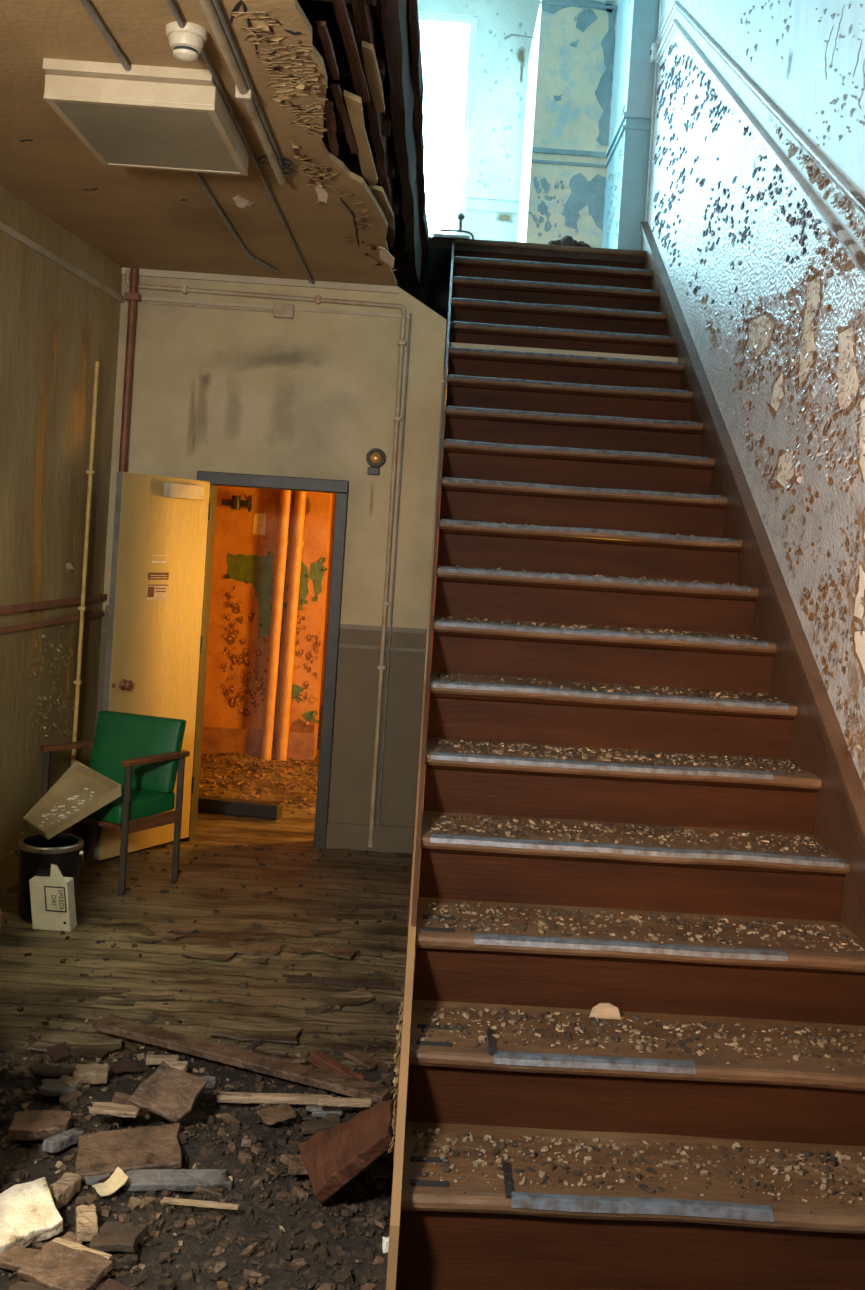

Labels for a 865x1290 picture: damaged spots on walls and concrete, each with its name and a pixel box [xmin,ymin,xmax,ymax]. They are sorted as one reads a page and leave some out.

peeling [529,0,625,239]
peeling [222,551,328,742]